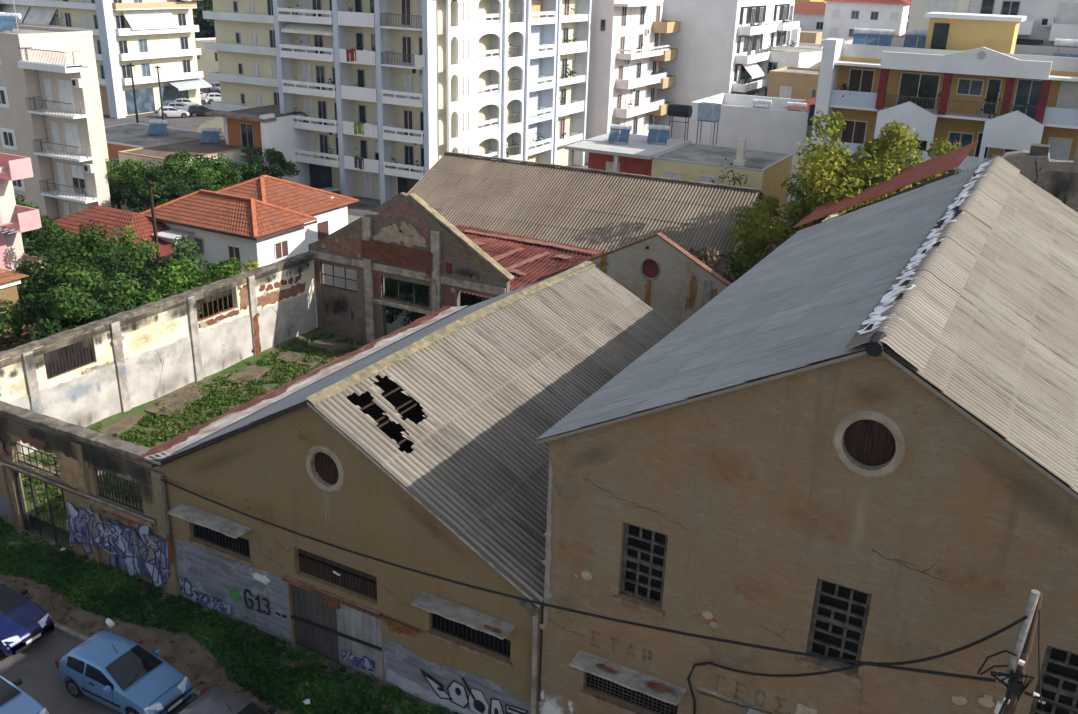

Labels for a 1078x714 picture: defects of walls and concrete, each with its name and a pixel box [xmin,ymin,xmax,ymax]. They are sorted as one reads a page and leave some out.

flaking render [319,220,429,258]
flaking render [199,262,320,328]
spalling [373,271,382,298]
crack [872,549,961,586]
peeling [538,690,573,714]
rust [647,682,672,693]
spalling [952,694,995,708]